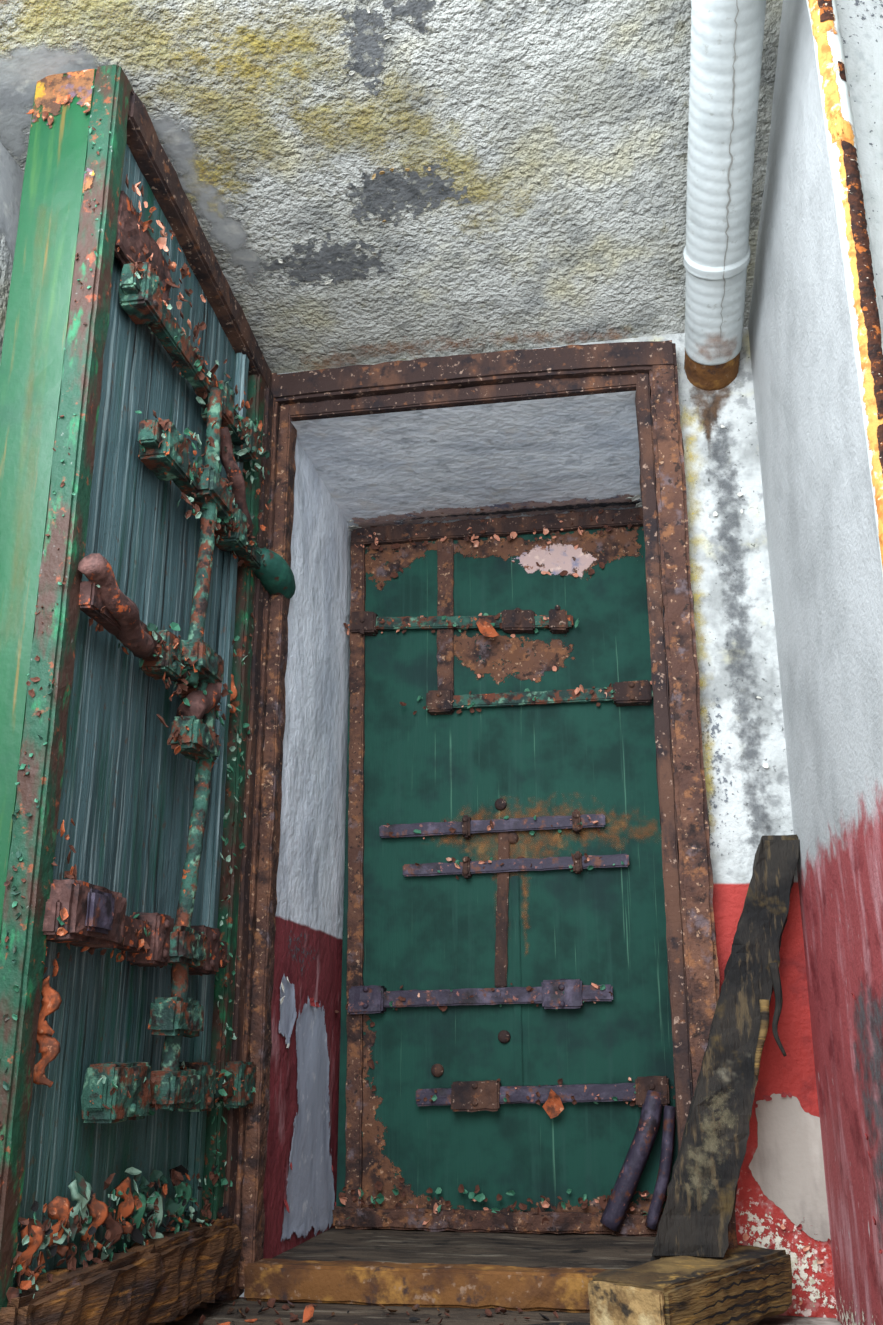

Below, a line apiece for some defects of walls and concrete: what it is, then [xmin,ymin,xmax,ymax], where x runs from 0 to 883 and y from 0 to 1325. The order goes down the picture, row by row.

leakage [21,0,128,30]
leakage [219,28,316,74]
corrosion [454,630,578,685]
peeling [278,931,613,1241]
peeling [494,1077,636,1118]
peeling [627,1190,667,1219]
peeling [739,1092,834,1314]